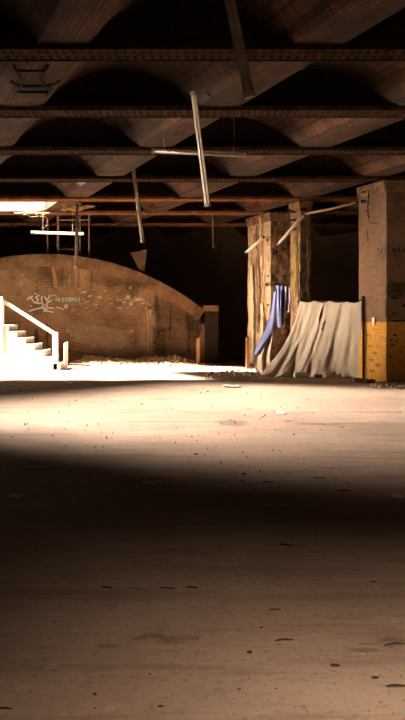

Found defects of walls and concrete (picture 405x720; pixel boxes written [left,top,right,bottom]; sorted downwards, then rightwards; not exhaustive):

crack [364,190,377,241]